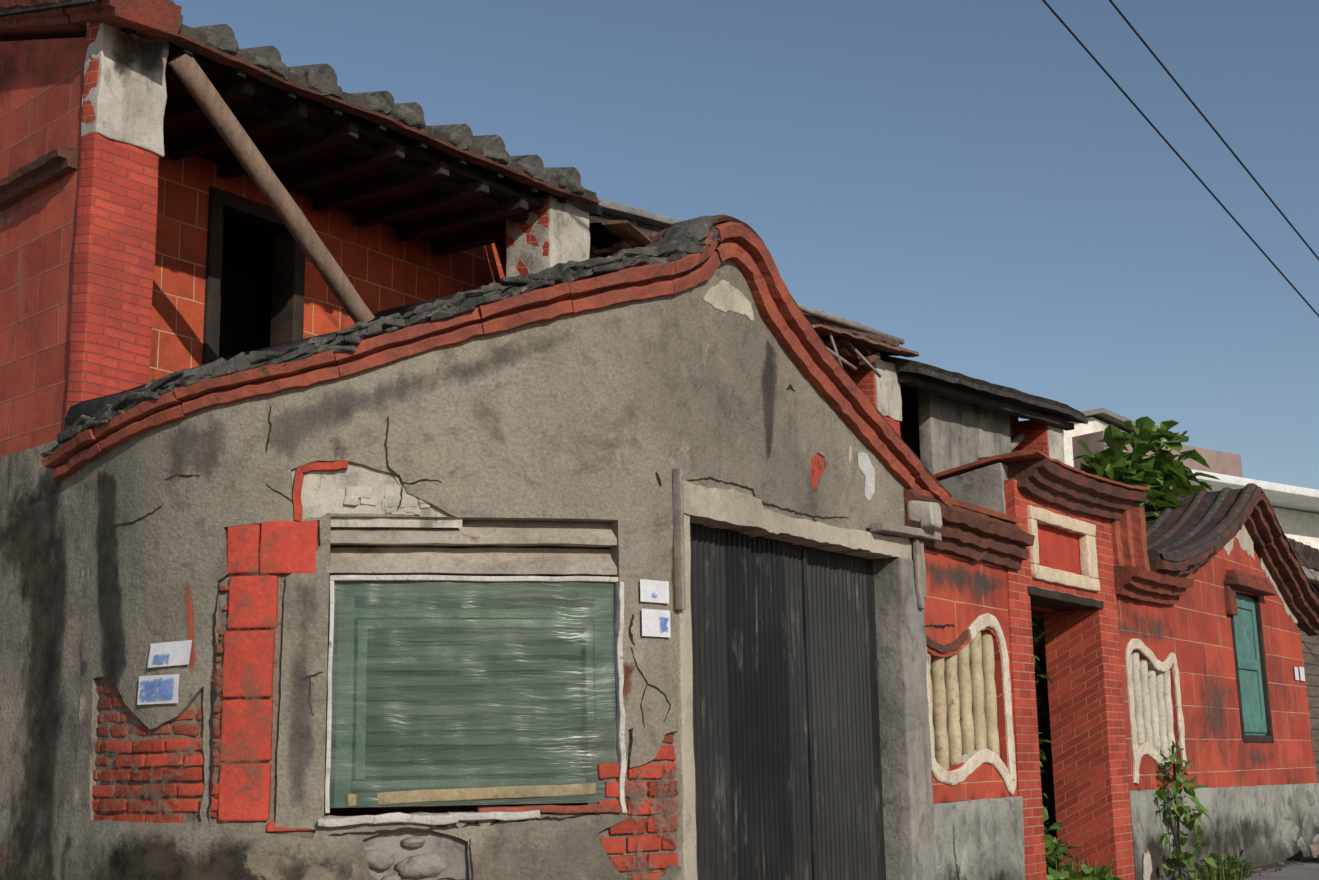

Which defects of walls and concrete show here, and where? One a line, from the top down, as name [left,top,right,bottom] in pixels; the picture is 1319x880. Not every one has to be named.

crack [265,406,273,452]
crack [384,417,442,509]
crack [656,472,848,522]
damp [763,342,775,456]
spalling [810,454,825,492]
damp [97,472,125,689]
damp [0,473,66,880]
spalling [87,460,462,838]
crack [623,614,671,728]
spalling [363,830,469,880]
spalling [588,721,680,880]